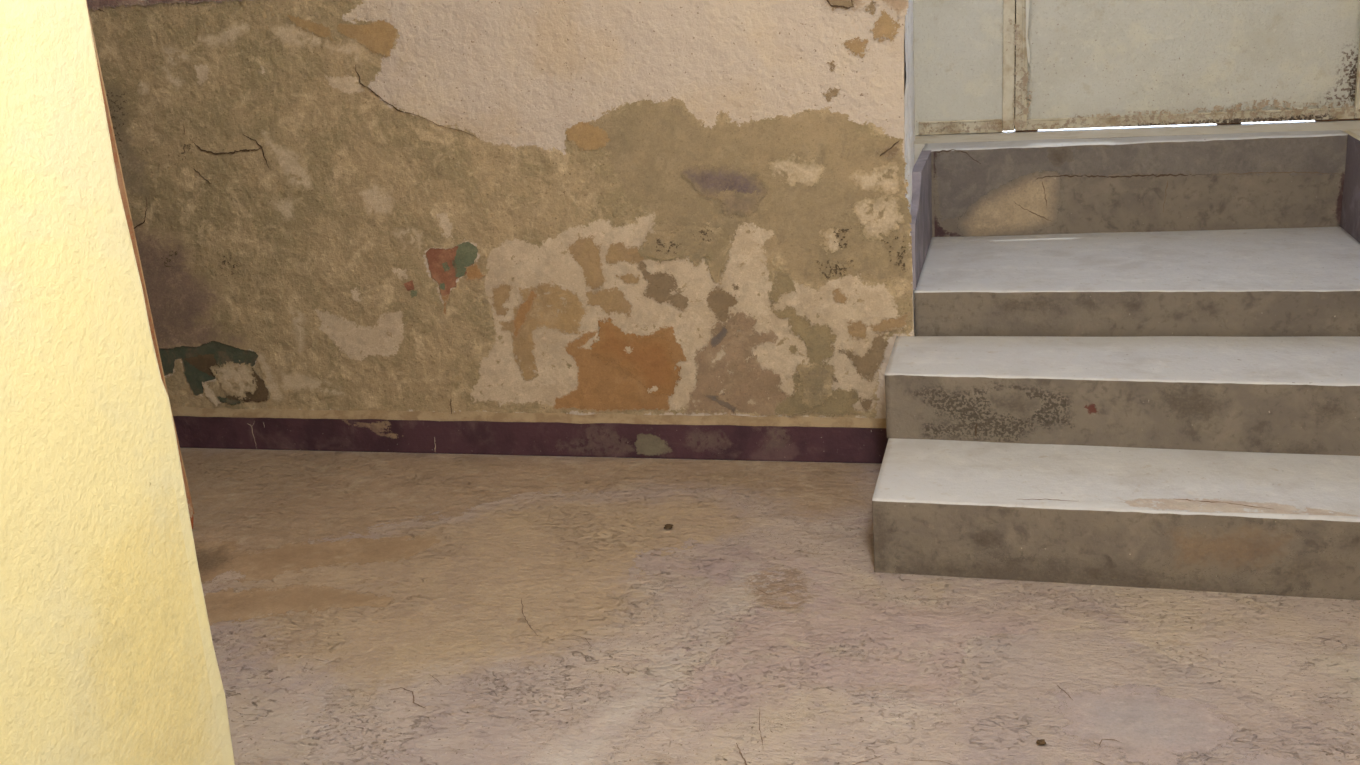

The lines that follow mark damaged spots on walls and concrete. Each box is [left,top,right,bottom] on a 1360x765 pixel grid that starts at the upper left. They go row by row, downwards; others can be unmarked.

peeling [87,0,254,100]
peeling [269,21,365,95]
crack [355,65,479,139]
crack [178,125,269,184]
peeling [260,128,317,224]
peeling [768,151,826,188]
peeling [848,161,905,242]
flaking render [159,304,405,407]
peeling [358,181,907,457]
peeling [341,419,404,439]